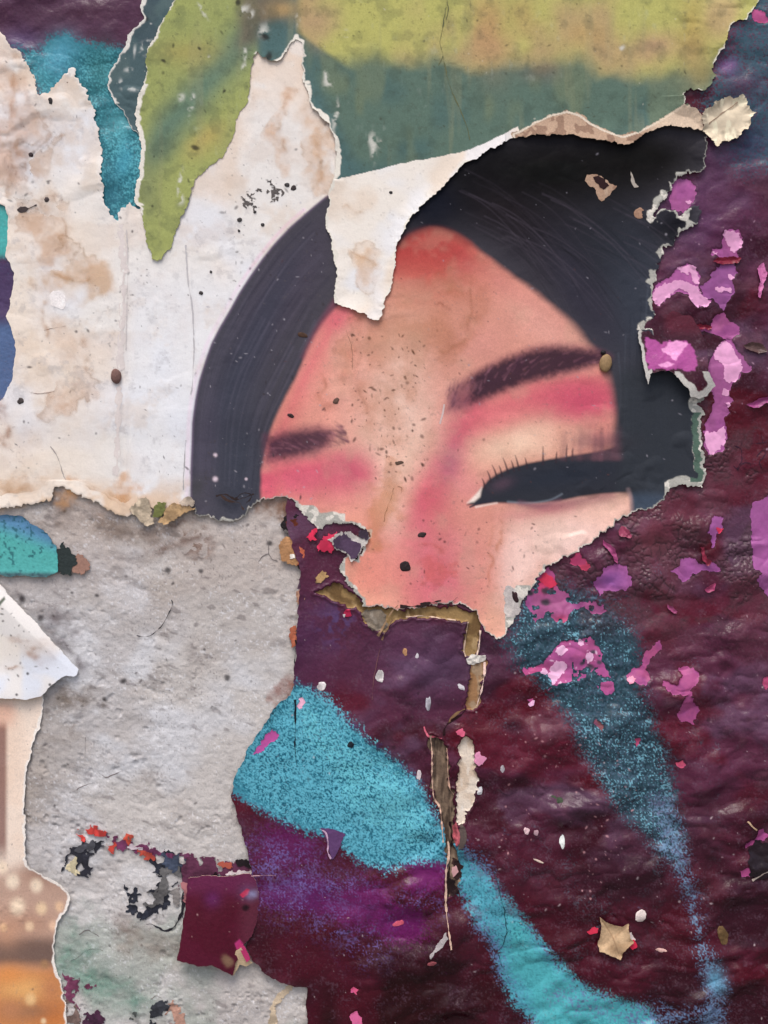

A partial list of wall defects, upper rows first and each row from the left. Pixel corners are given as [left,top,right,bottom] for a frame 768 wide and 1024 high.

peeling [669,179,697,213]
peeling [307,528,370,562]
peeling [0,486,308,1024]
peeling [455,728,487,825]